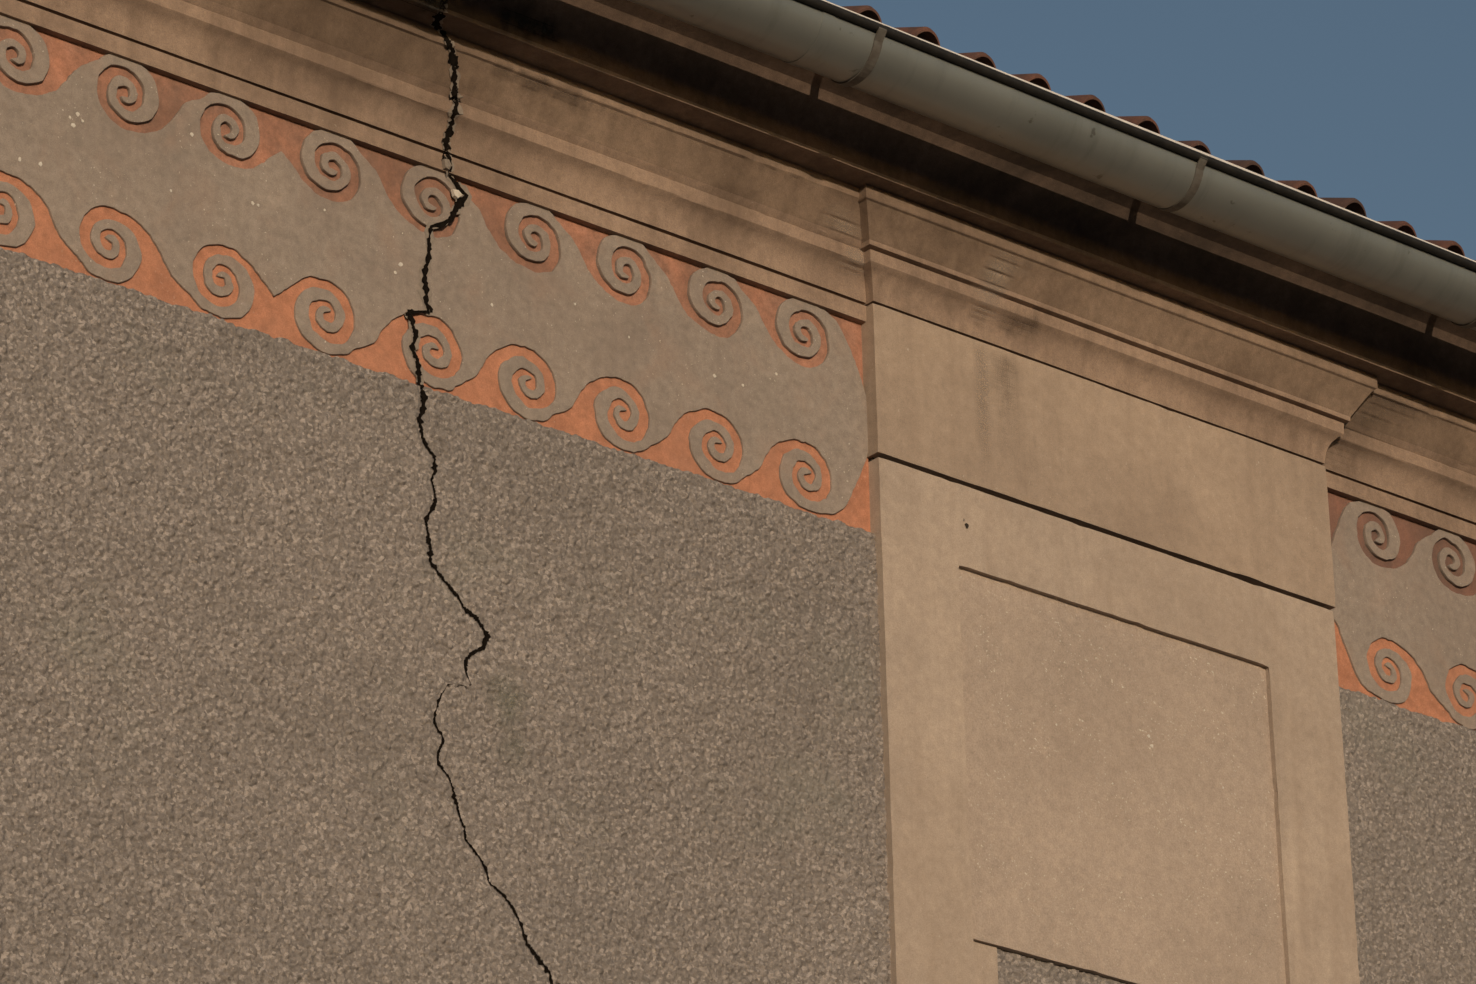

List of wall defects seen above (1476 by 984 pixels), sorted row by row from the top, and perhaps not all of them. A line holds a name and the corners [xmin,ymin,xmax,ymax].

crack [404,0,561,984]